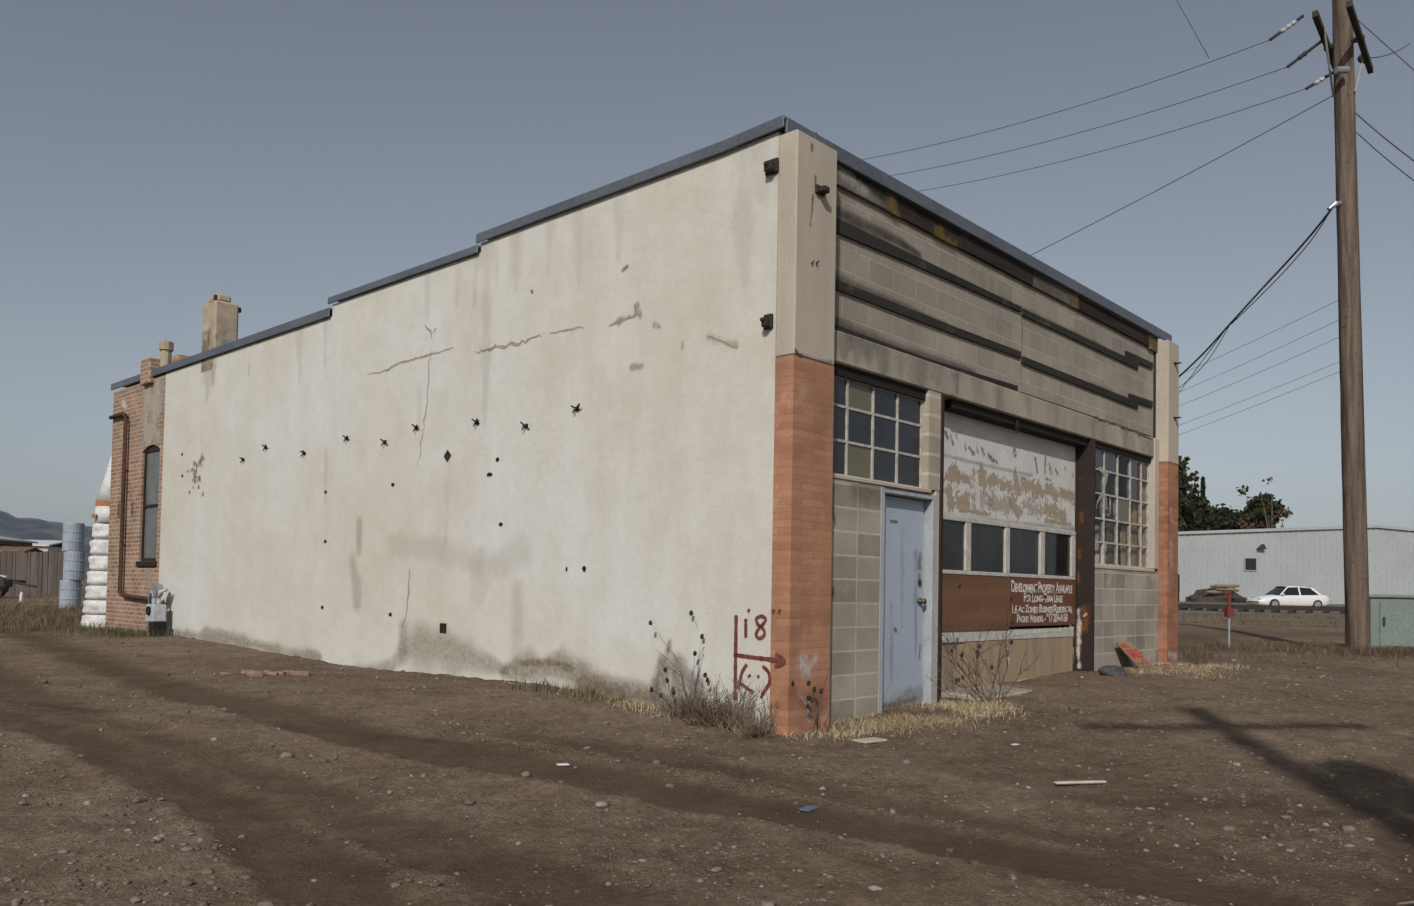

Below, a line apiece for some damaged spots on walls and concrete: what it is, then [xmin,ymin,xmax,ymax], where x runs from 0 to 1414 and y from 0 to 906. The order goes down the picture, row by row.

water stain [856,174,888,202]
crack [370,312,638,464]
peeling [944,431,1083,526]